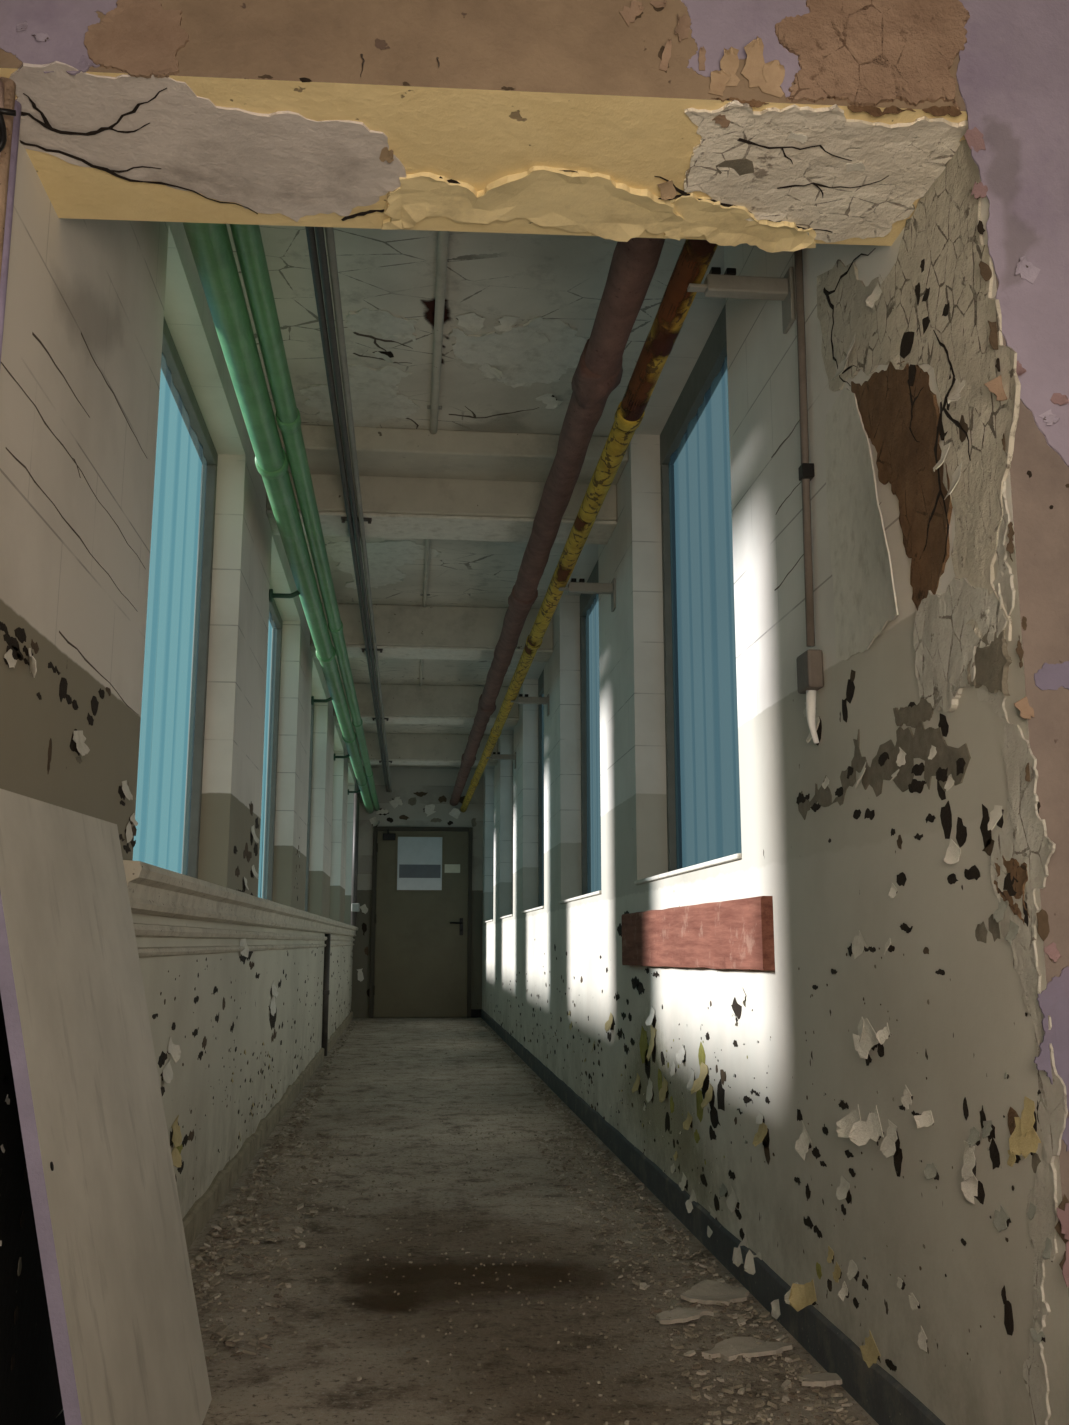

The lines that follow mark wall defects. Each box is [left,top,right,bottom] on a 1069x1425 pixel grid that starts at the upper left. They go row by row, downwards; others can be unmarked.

crack [20,88,258,214]
crack [654,138,889,233]
crack [823,250,873,385]
peeling [0,621,111,764]
peeling [842,670,856,723]
peeling [947,865,980,884]
peeling [152,904,370,1197]
peeling [852,997,898,1066]
peeling [494,944,775,1324]
peeling [771,1083,934,1319]
peeling [961,1105,1000,1204]
peeling [980,1285,1014,1336]